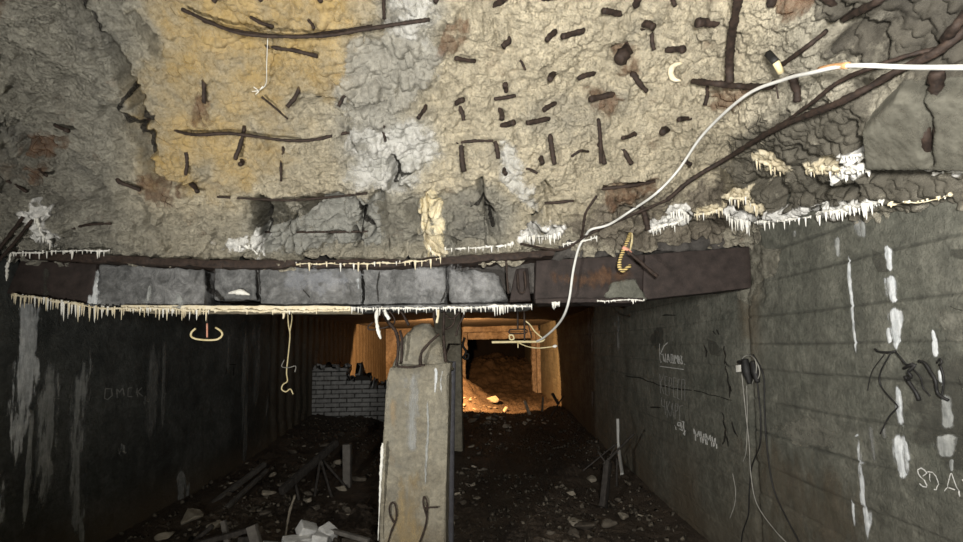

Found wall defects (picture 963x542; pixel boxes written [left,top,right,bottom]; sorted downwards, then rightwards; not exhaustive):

spalling [0,216,33,261]
water stain [5,197,110,281]
water stain [151,0,353,188]
spalling [217,190,386,254]
spalling [173,0,445,143]
water stain [296,83,963,288]
spalling [520,0,963,251]
spalling [737,243,781,306]
water stain [811,0,963,81]
water stain [884,246,903,349]
water stain [8,272,532,542]
water stain [851,330,963,537]